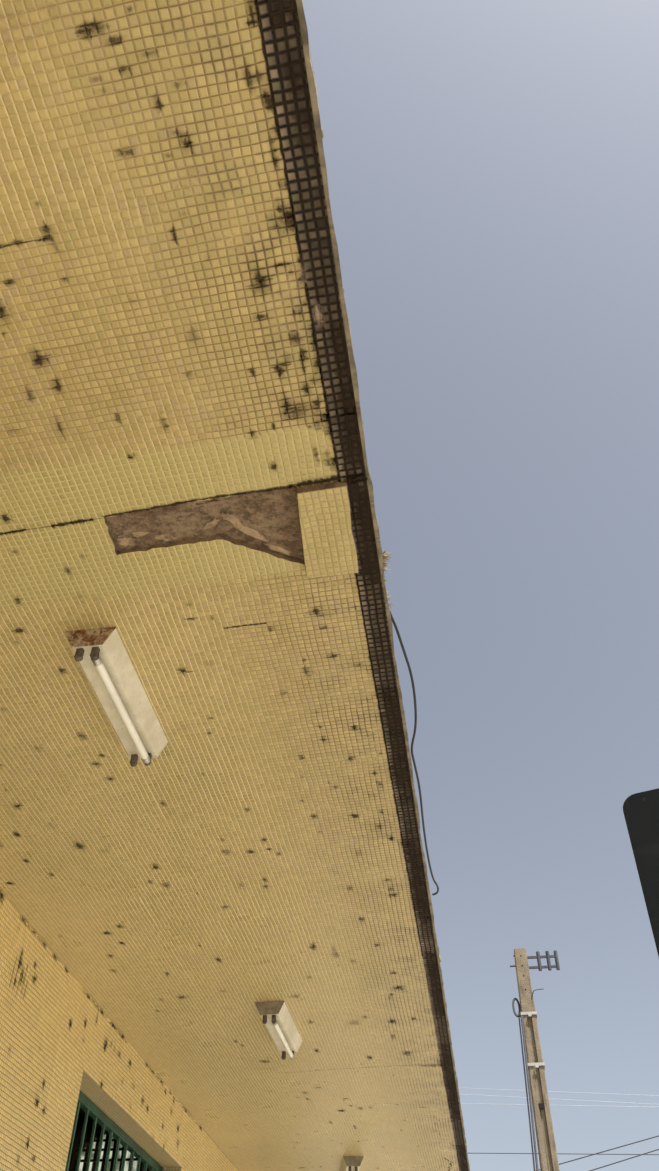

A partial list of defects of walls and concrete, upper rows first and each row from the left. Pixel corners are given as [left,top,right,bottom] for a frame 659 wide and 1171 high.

crack [0,473,368,535]
spalling [106,486,304,560]
leakage [245,0,469,1171]